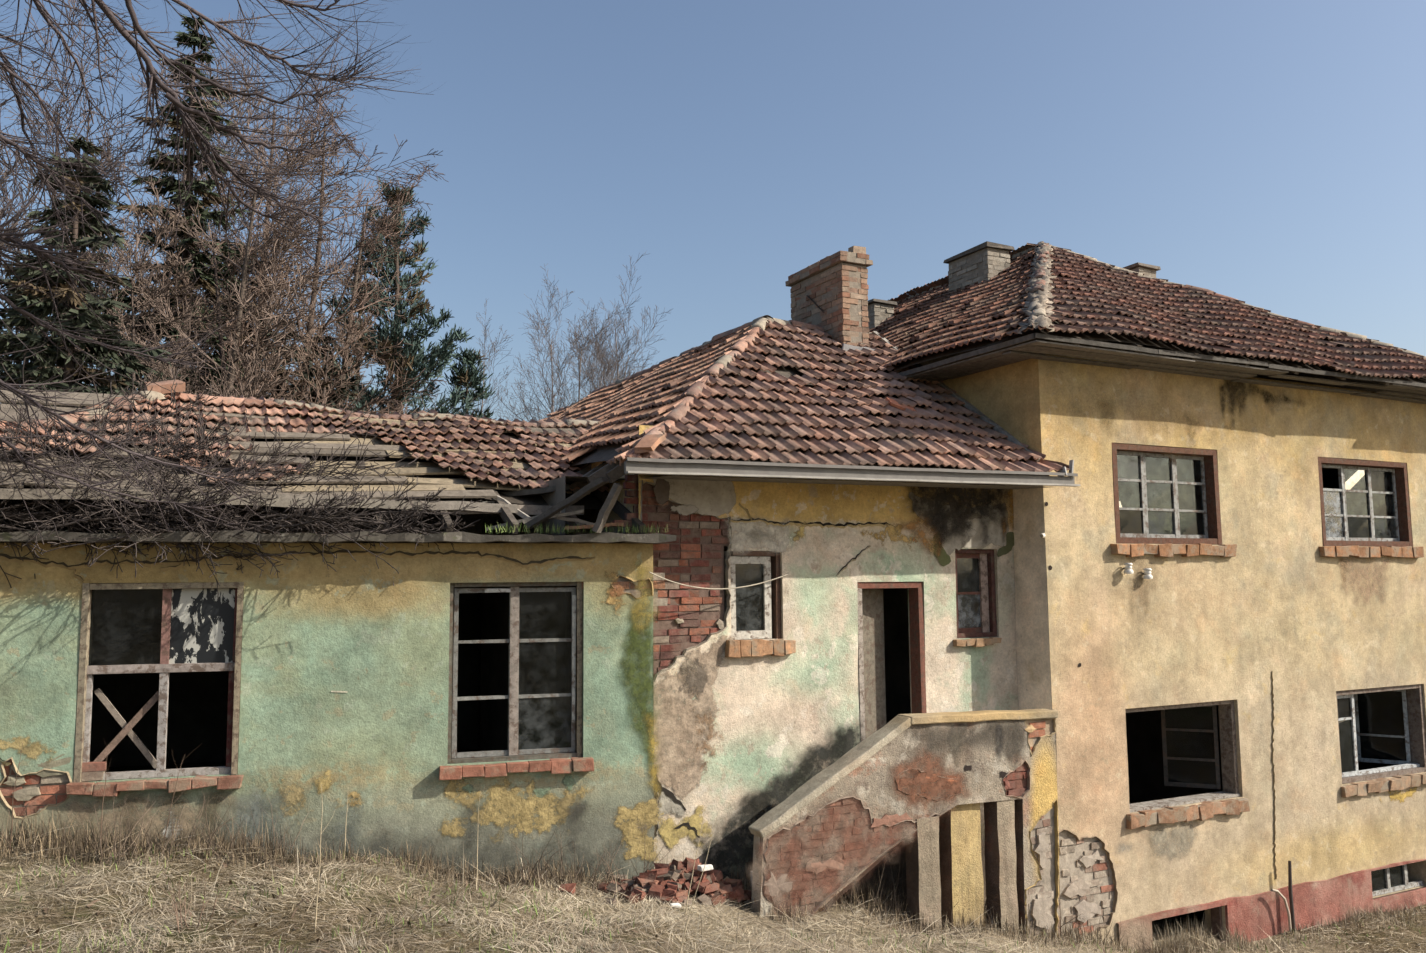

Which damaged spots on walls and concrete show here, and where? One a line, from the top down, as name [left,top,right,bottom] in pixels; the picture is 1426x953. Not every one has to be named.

leakage [905,482,1006,541]
flaking render [602,474,806,863]
flaking render [0,736,107,820]
peeling [438,774,589,842]
flaking render [757,765,972,917]
flaking render [1025,799,1129,938]